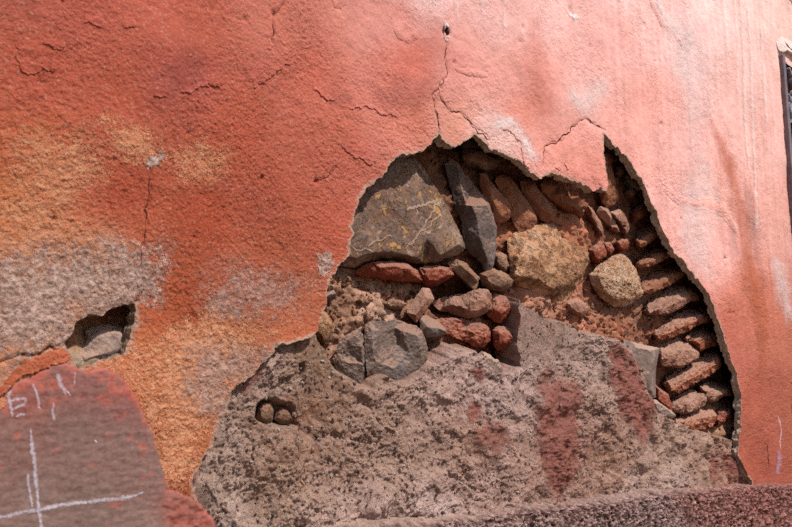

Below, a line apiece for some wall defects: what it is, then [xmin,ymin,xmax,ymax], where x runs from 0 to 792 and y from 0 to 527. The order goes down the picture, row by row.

crack [433,38,472,130]
spalling [0,303,136,395]
spalling [192,113,753,527]